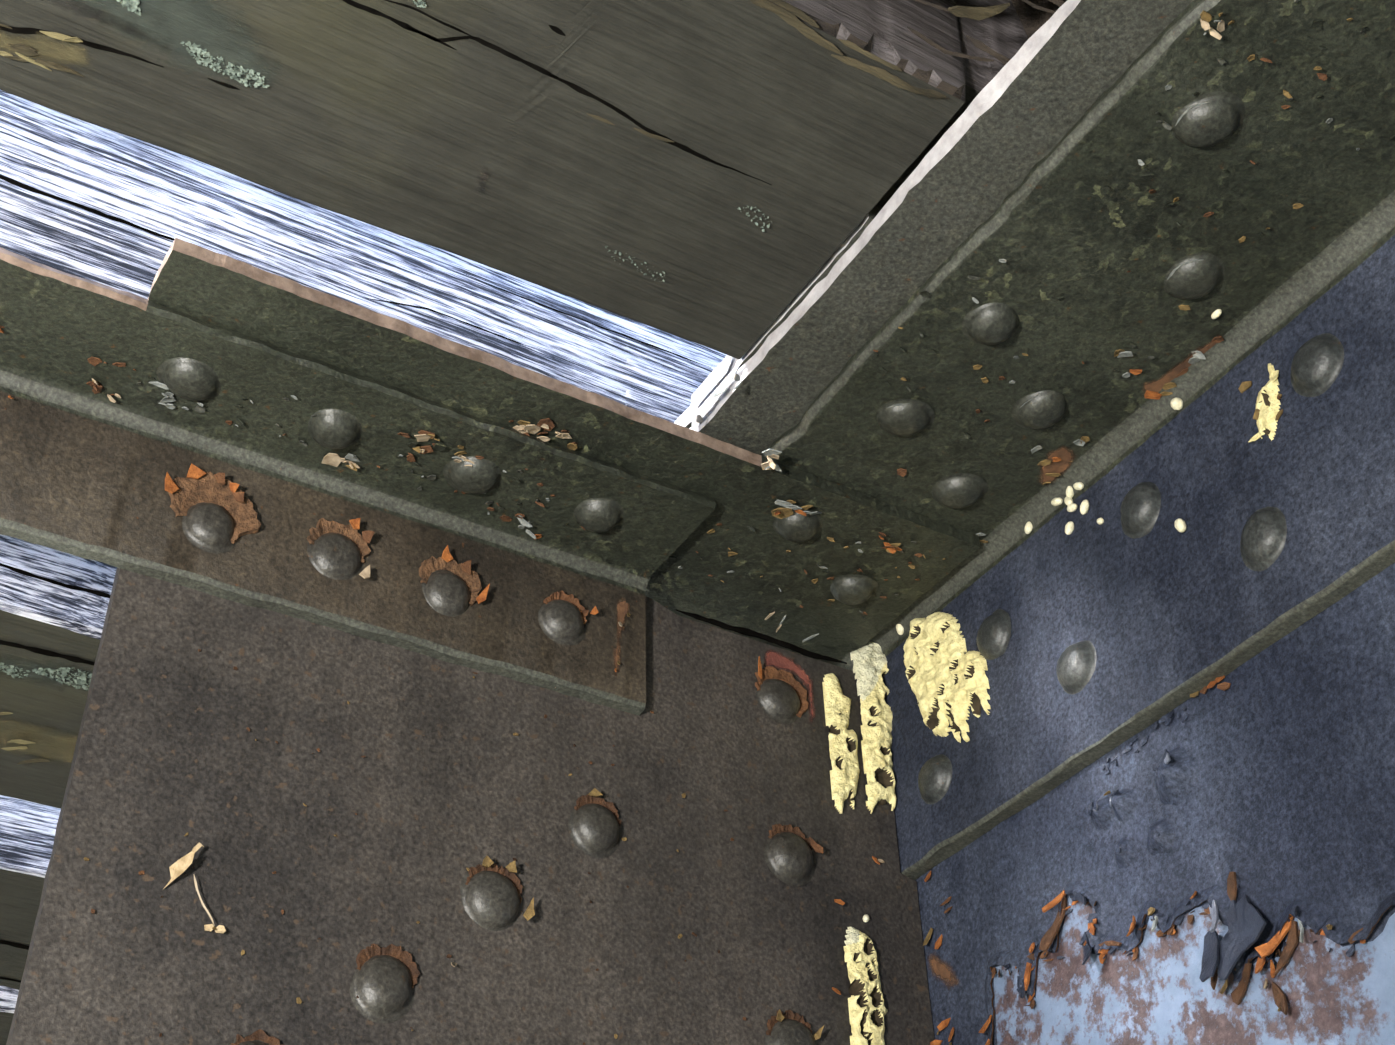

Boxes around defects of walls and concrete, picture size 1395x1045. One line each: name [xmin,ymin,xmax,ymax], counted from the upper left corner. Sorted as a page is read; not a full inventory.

crack [208,78,240,90]
crack [342,0,771,185]
crack [676,609,847,664]
rust [765,651,814,717]
peeling [978,872,1395,1045]